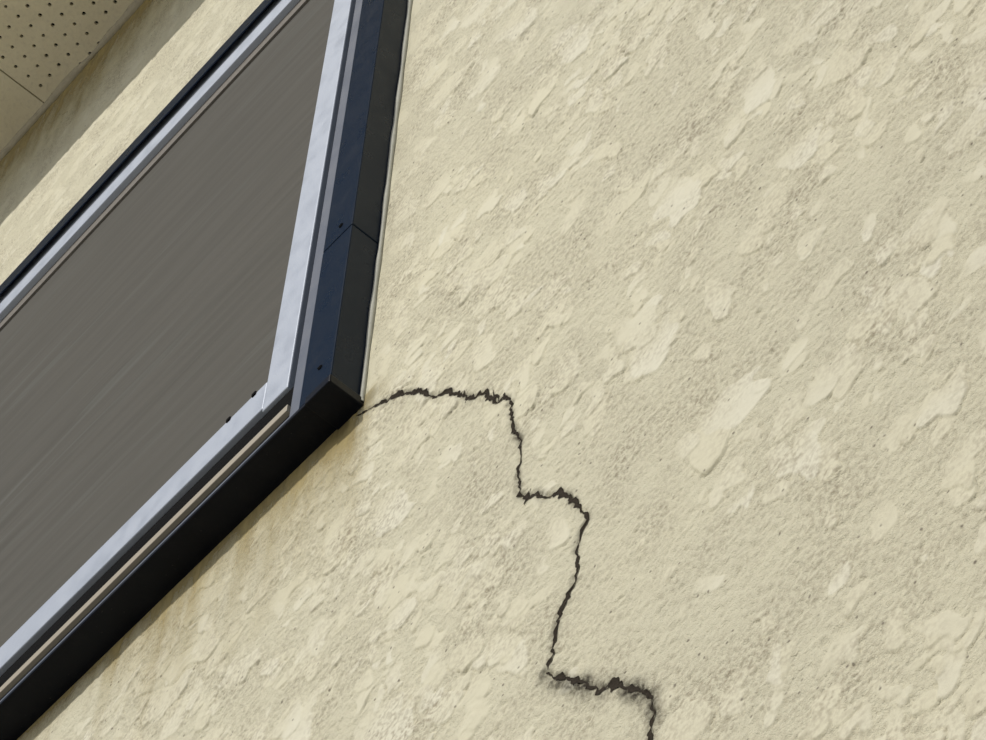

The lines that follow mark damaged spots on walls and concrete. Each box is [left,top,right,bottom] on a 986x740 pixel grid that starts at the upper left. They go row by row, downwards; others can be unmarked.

crack [358,387,656,740]